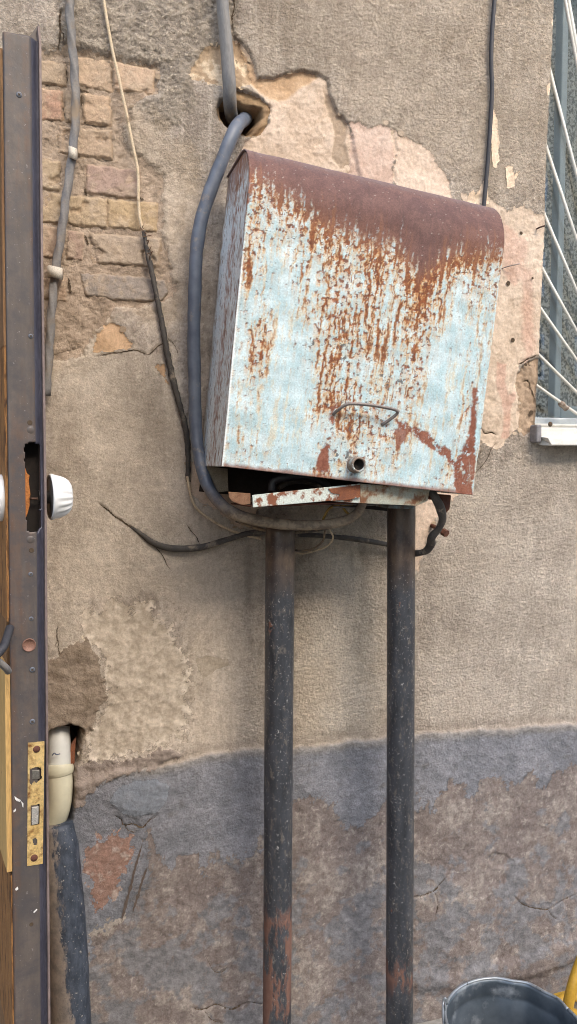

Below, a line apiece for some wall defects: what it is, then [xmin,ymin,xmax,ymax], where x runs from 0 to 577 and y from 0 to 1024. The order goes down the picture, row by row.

flaking render [41,44,178,361]
flaking render [189,40,545,454]
flaking render [415,492,459,572]
flaking render [64,589,229,809]
peeling [82,828,264,1024]
peeling [291,795,386,1024]